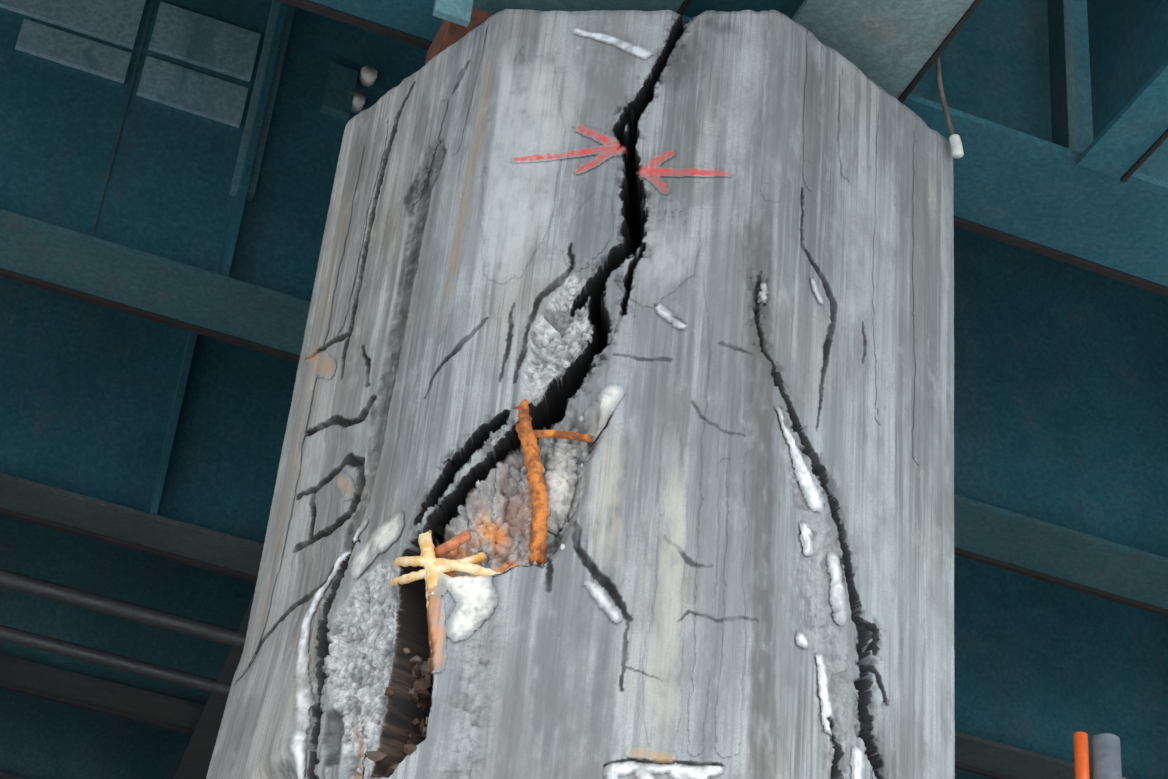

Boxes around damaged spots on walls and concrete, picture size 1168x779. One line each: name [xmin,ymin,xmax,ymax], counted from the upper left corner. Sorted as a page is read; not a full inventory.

crack [234,80,416,779]
spalling [342,135,448,557]
corrosion [423,567,448,681]
spalling [316,273,616,779]
water stain [412,26,565,346]
corrosion [443,449,550,577]
crack [405,18,692,569]
crack [546,520,645,691]
peeling [584,578,623,623]
water stain [437,10,848,779]
crack [741,186,888,779]
water stain [873,111,890,425]